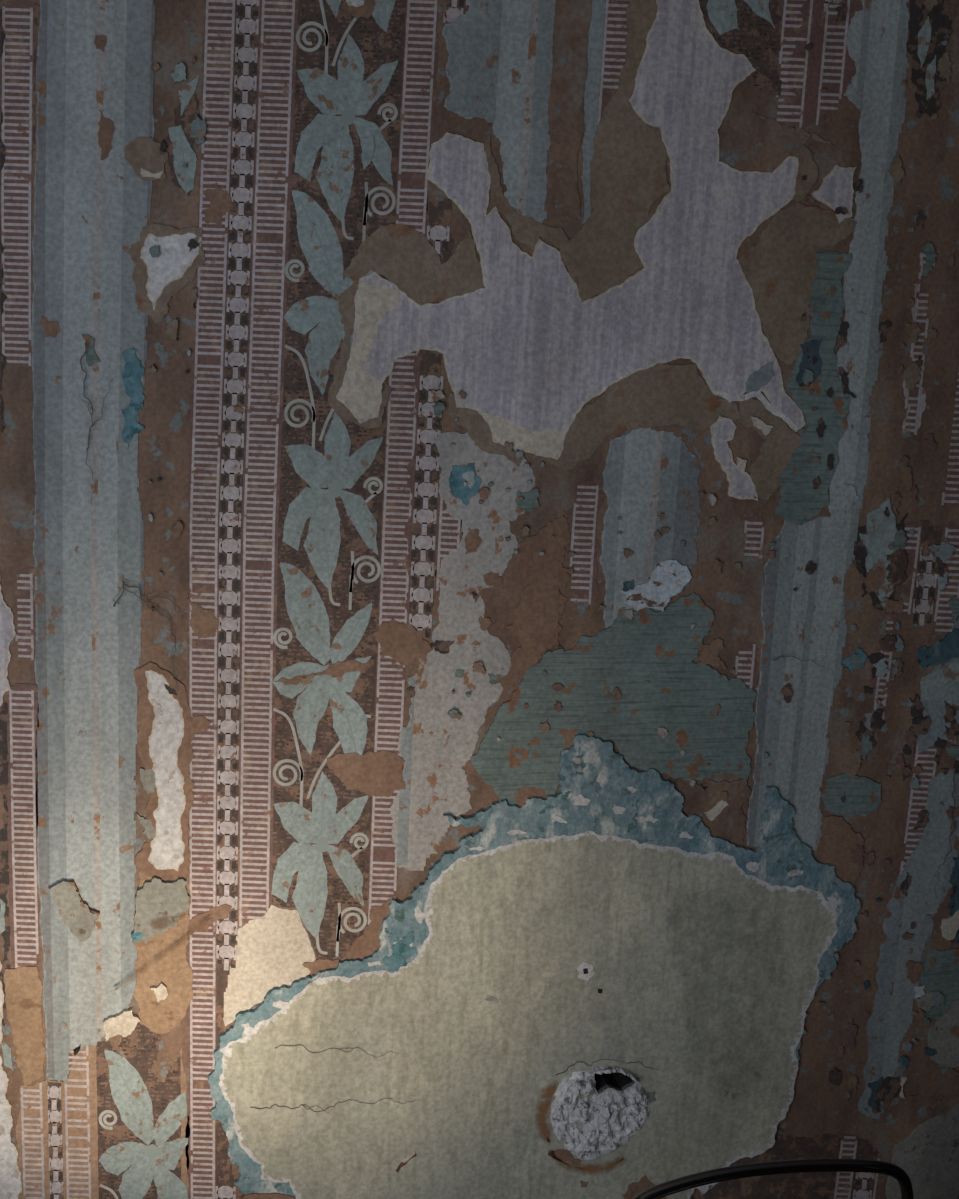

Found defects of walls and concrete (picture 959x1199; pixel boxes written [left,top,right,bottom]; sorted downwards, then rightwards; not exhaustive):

flaking render [361,0,863,456]
flaking render [708,418,757,506]
peeling [813,454,834,489]
peeling [621,559,692,620]
flaking render [131,671,190,944]
peeling [704,800,729,821]
crack [276,1044,398,1058]
crack [250,1098,415,1112]
spalling [550,1066,656,1187]
spalling [396,1151,416,1173]
peeling [623,1175,667,1199]